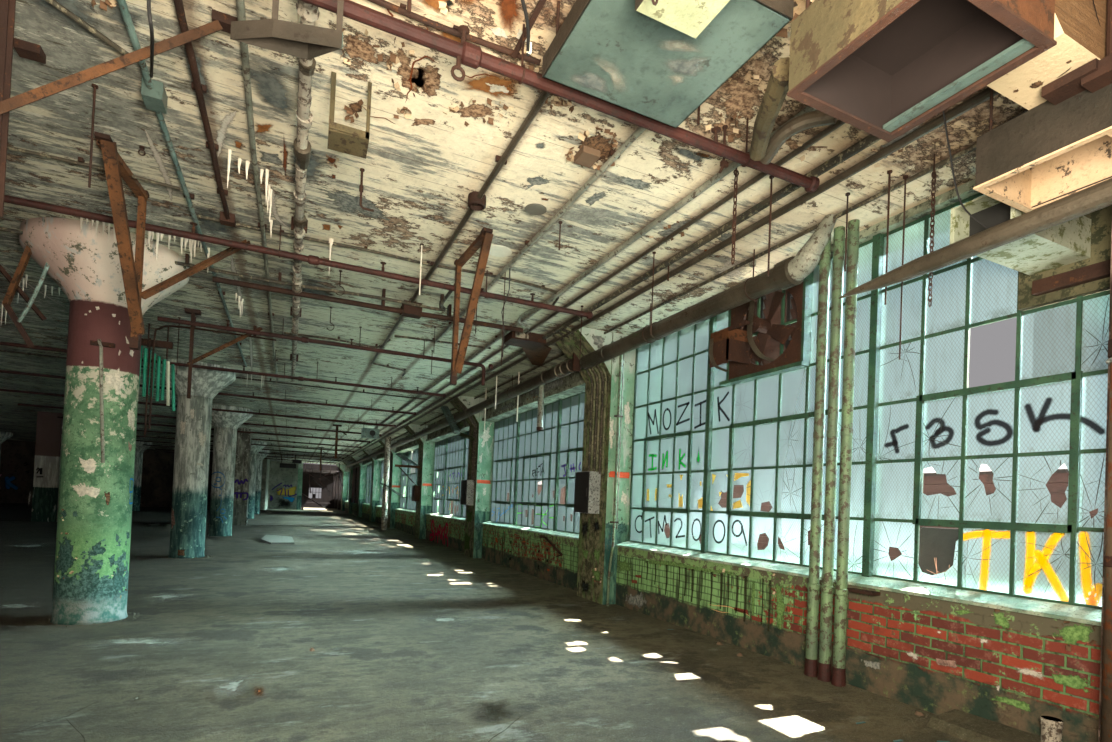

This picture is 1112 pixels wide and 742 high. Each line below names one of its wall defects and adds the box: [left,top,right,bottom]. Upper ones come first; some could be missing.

spalling [439,0,455,15]
peeling [340,28,513,126]
flaking render [491,27,541,72]
peeling [103,337,135,452]
peeling [70,458,111,505]
peeling [57,509,78,579]
peeling [90,531,130,598]